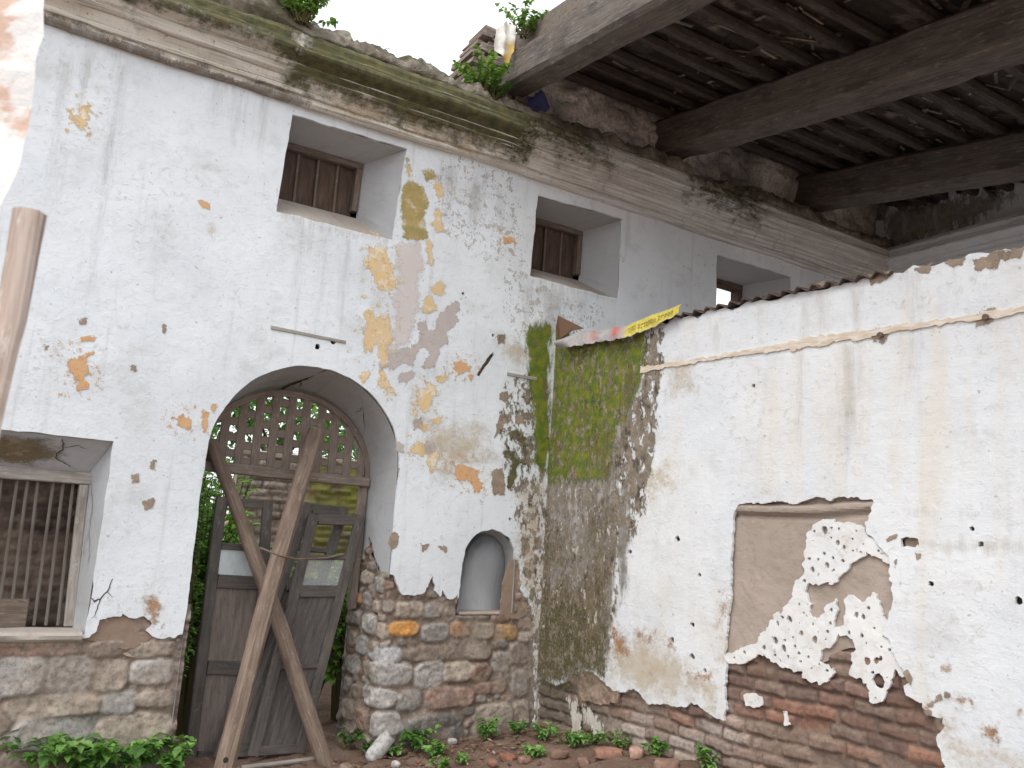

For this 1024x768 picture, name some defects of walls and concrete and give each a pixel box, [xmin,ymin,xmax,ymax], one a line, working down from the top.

flaking render [65,93,105,144]
damp [44,0,612,165]
spalling [945,247,1024,271]
peeling [44,317,104,400]
crack [55,439,86,470]
peeling [164,402,218,443]
spalling [336,156,951,768]
damp [537,337,642,684]
crack [91,579,113,617]
spalling [0,596,191,768]